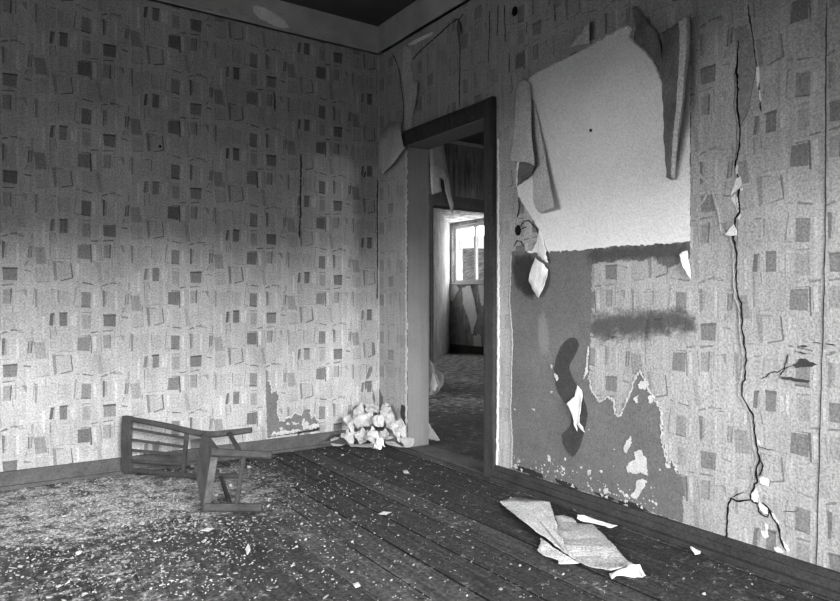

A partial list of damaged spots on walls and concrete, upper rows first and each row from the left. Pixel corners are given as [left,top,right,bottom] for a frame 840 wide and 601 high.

peeling [393,18,458,130]
peeling [496,6,691,522]
leakage [590,310,694,338]
crack [725,4,798,553]
peeling [266,380,320,438]